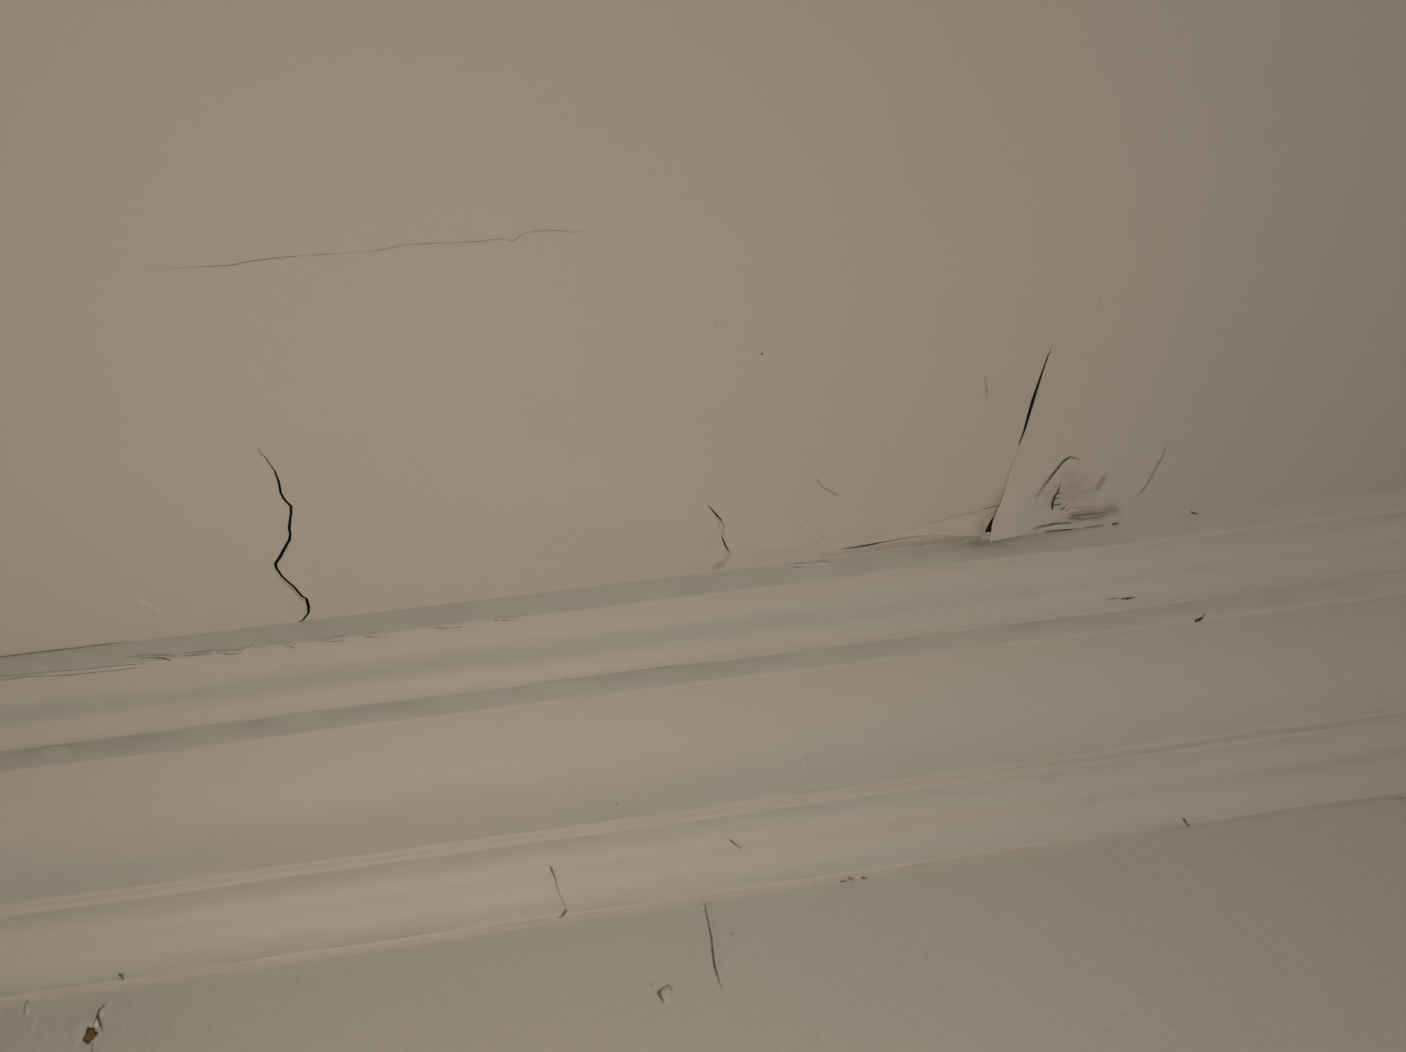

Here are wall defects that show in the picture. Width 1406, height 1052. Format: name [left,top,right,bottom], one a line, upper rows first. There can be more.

crack [264,457,326,622]
peeling [985,353,1133,542]